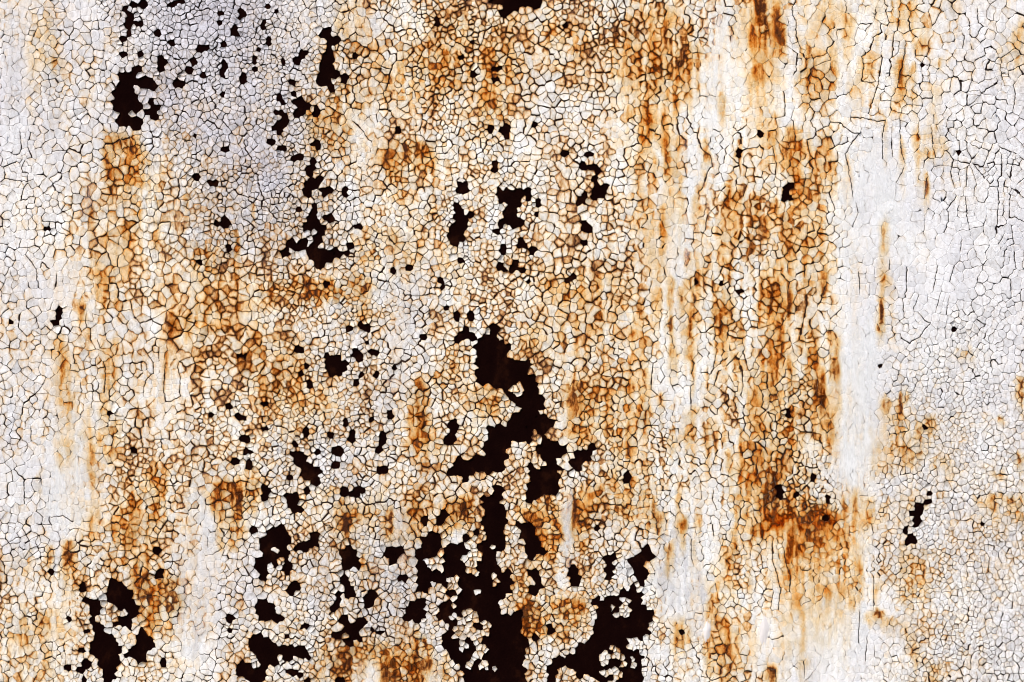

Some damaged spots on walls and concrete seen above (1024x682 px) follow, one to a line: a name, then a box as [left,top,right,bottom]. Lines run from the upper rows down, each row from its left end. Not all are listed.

peeling [262,21,362,293]
rust [627,25,690,137]
crack [850,0,970,183]
crack [0,355,59,505]
peeling [61,541,173,682]
peeling [219,400,396,682]
peeling [380,277,659,682]
crack [636,621,687,682]
rust [759,268,796,443]
rust [739,434,856,573]
rust [808,351,839,429]
crack [823,38,1024,682]